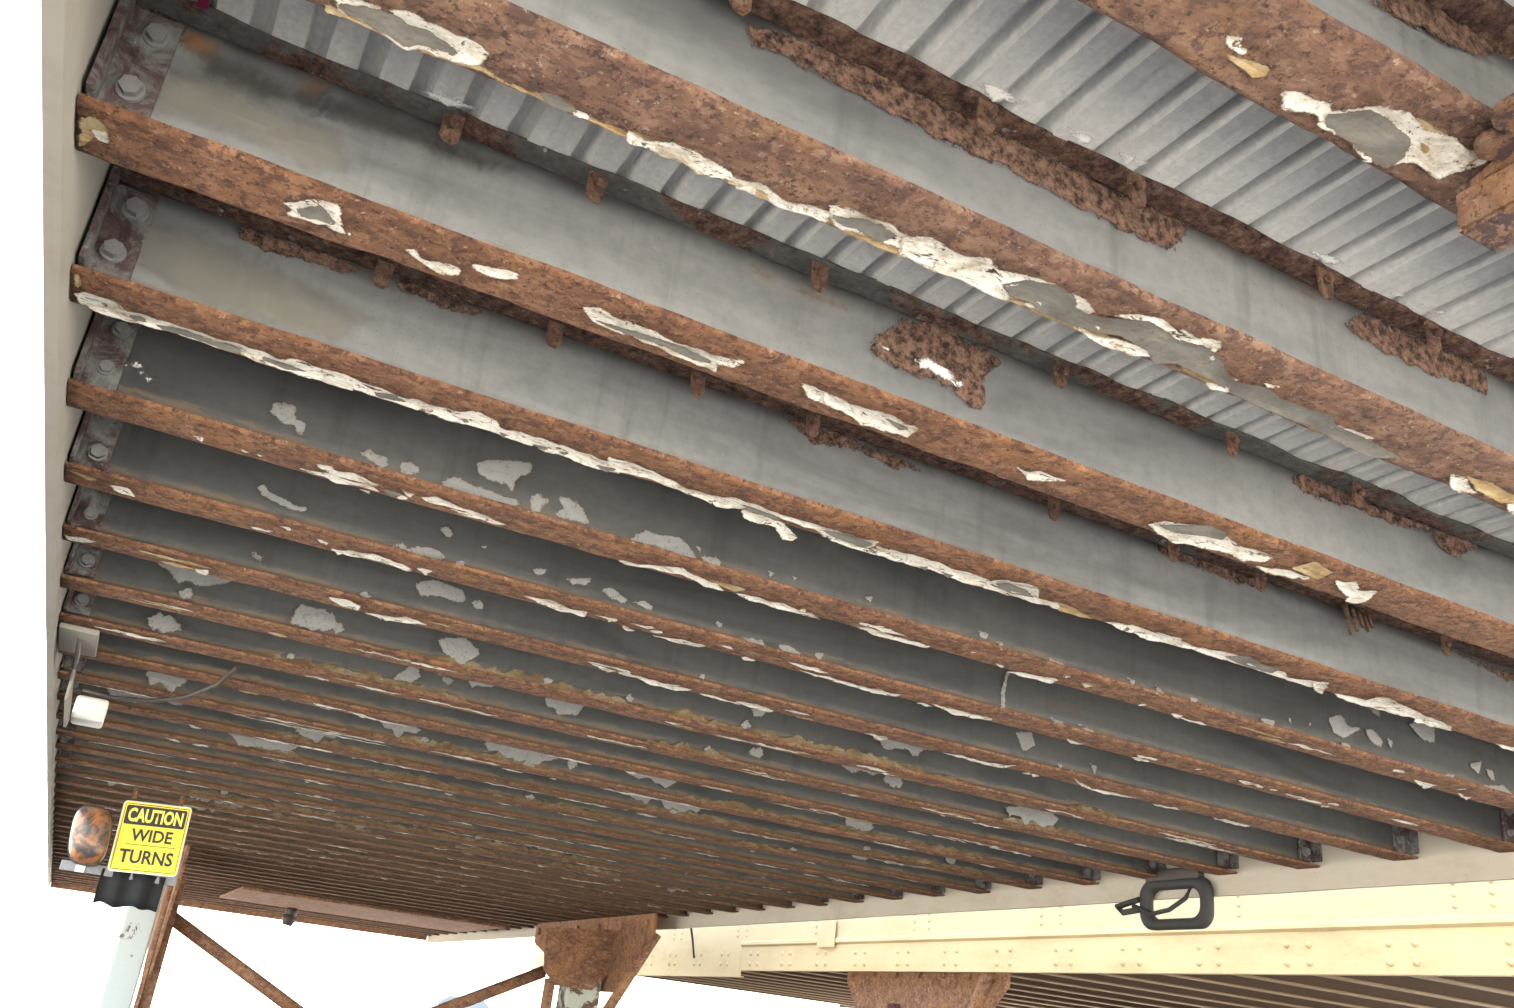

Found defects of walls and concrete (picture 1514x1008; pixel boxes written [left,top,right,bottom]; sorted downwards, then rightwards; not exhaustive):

rust [748,25,1186,251]
peeling [1280,91,1487,180]
rust [239,223,359,273]
peeling [283,199,351,236]
peeling [324,0,1401,459]
rust [391,277,481,316]
rust [870,318,1001,410]
rust [1345,313,1488,395]
peeling [65,274,1452,756]
rust [1293,474,1483,557]
peeling [80,671,1136,912]
peeling [1393,761,1512,800]